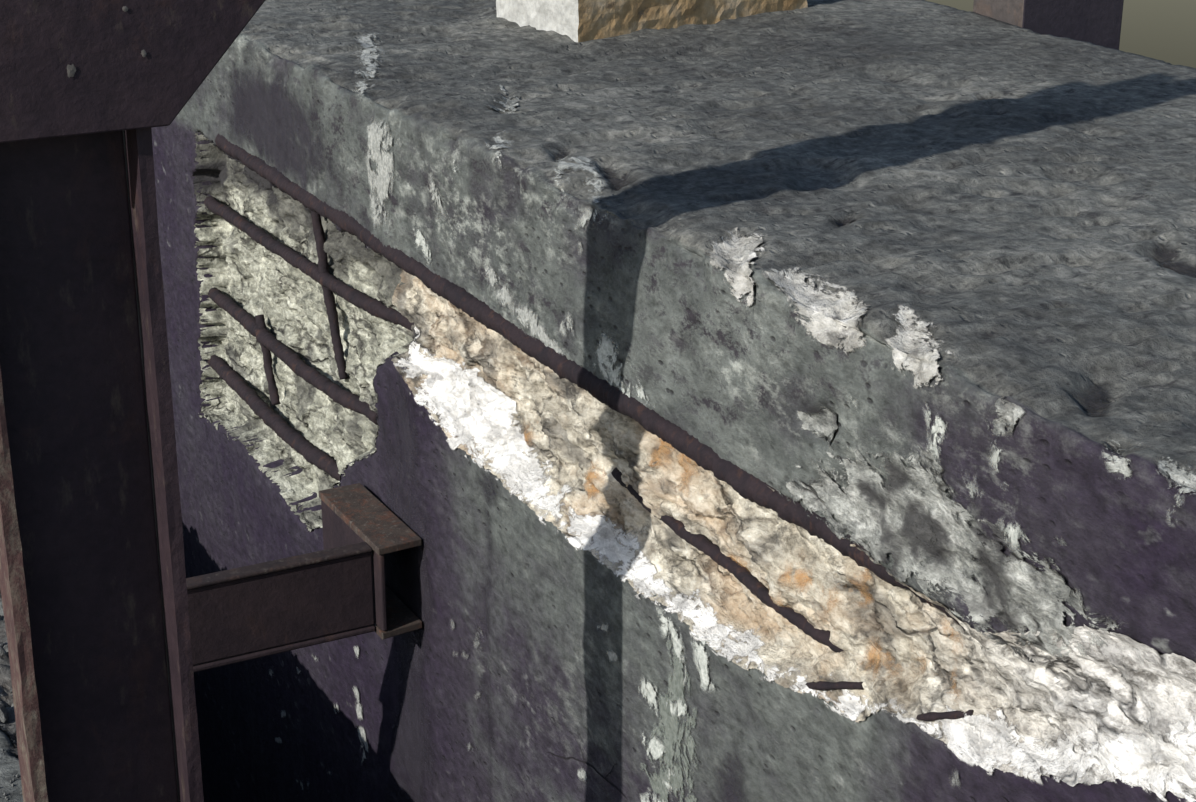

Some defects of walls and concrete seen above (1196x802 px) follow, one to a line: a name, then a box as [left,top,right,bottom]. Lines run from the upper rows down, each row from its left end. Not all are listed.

water stain [641,609,715,802]
spalling [192,130,1196,802]